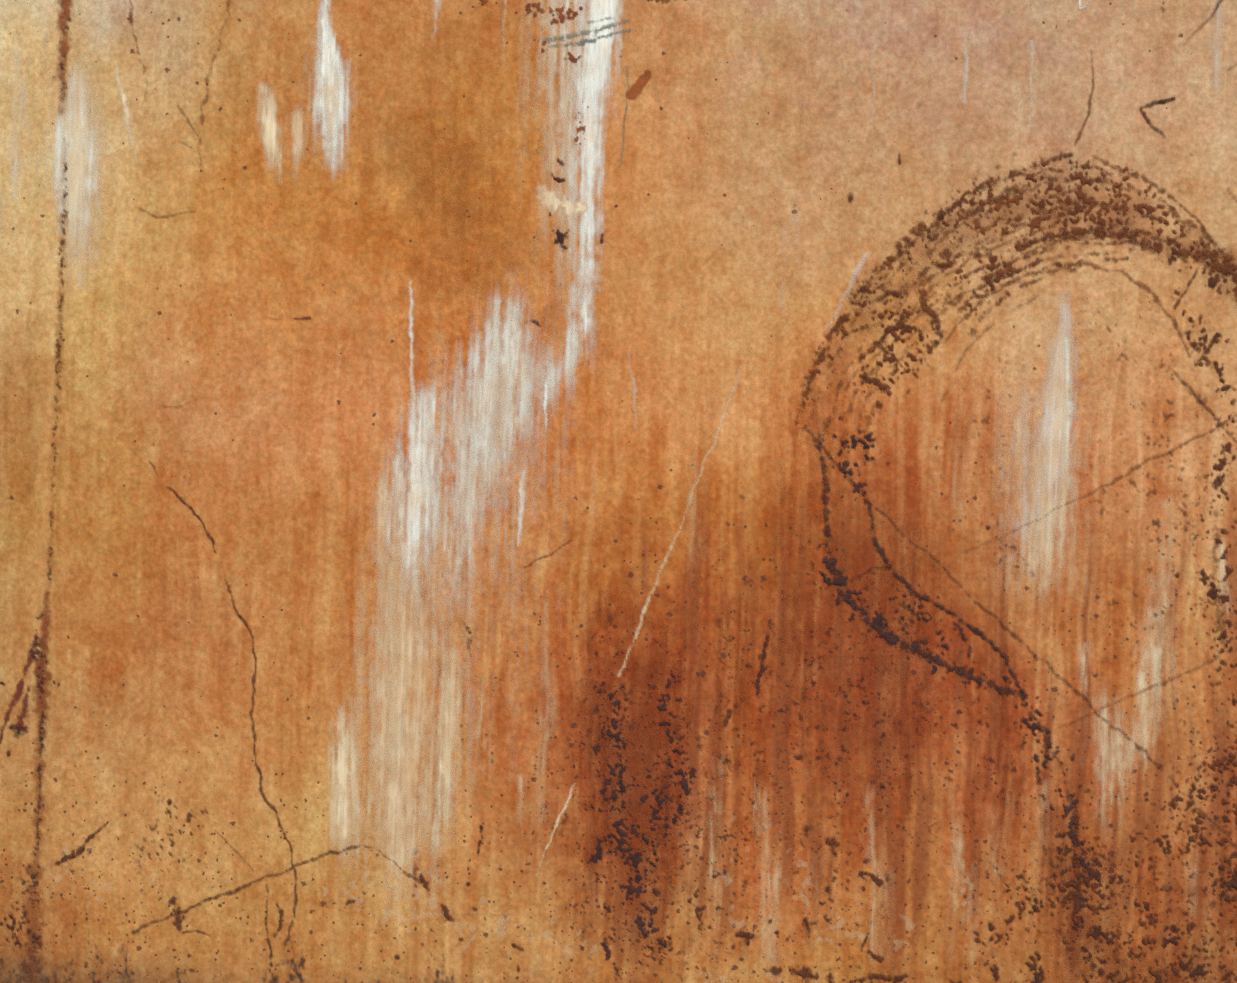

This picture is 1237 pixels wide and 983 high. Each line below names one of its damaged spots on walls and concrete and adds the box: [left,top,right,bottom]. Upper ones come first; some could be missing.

corrosion [58,0,70,99]
peeling [260,0,349,168]
corrosion [526,2,583,24]
corrosion [802,153,1237,415]
crack [151,464,214,545]
peeling [331,0,621,882]
corrosion [1153,310,1237,686]
corrosion [0,595,51,849]
corrosion [20,866,41,954]
crack [228,585,297,966]
corrosion [590,673,696,975]
corrosion [816,431,1237,983]